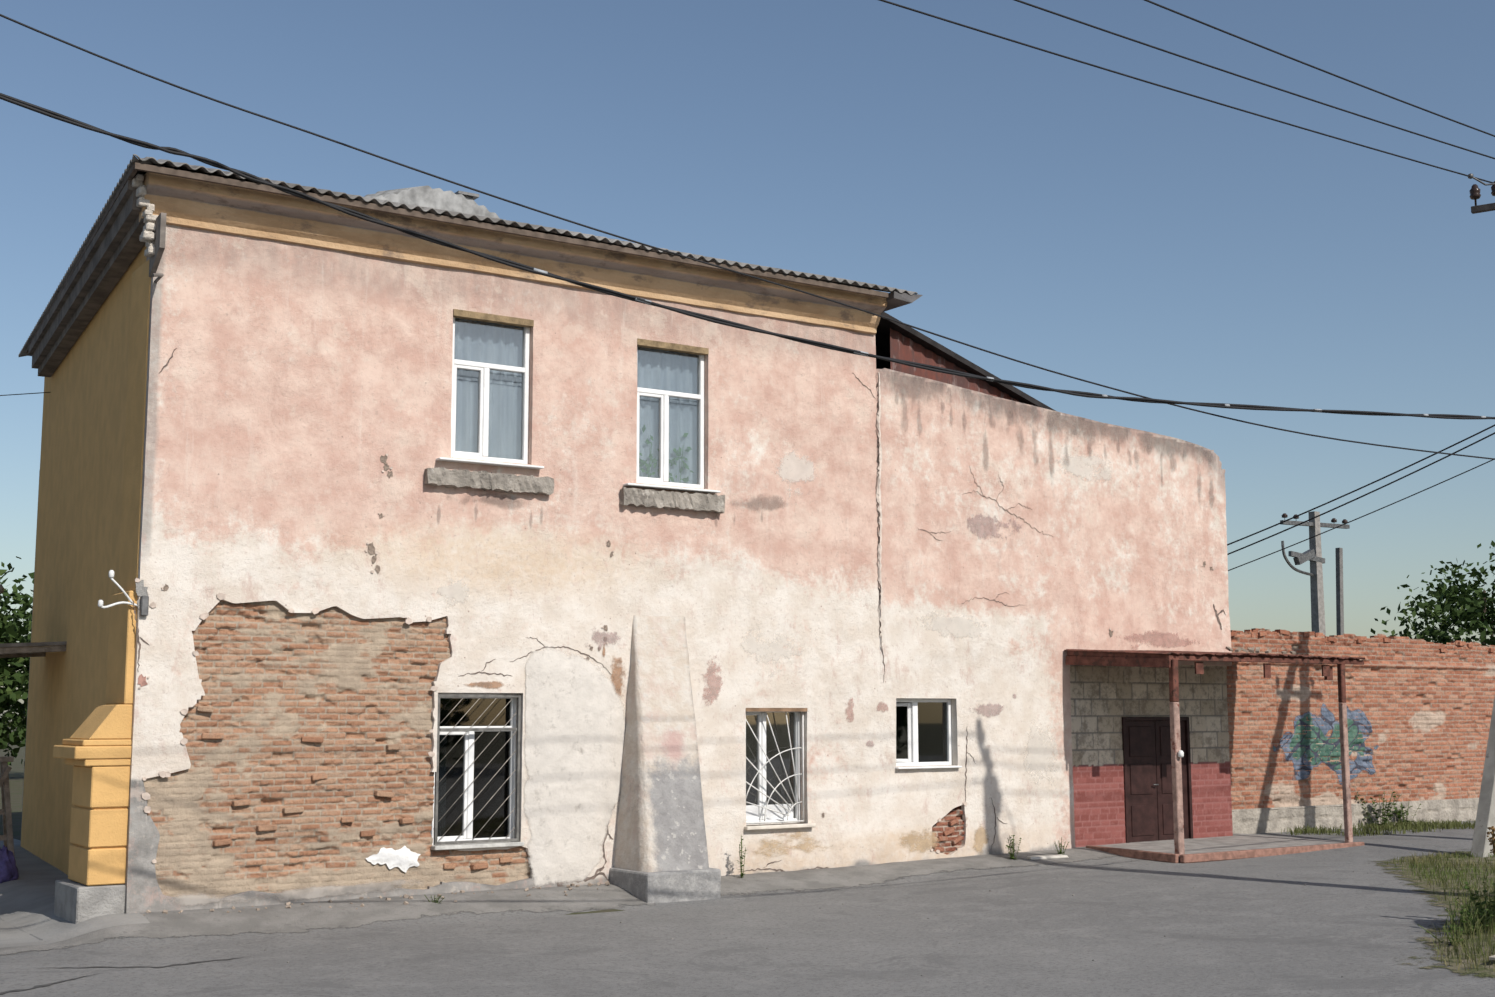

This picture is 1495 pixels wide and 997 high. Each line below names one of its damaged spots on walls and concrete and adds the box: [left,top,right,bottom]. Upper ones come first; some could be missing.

crack [853,373,885,683]
crack [964,469,1053,537]
crack [460,637,612,676]
spalling [141,593,530,899]
spalling [931,802,968,855]